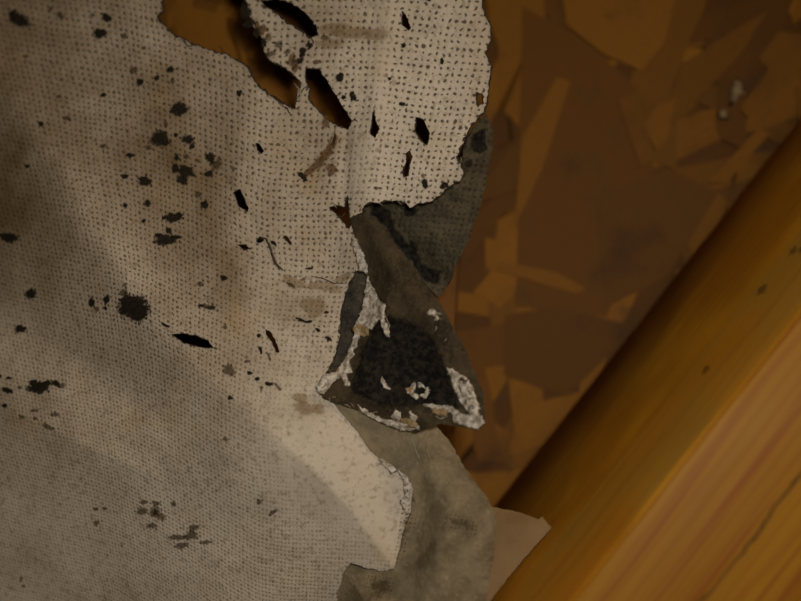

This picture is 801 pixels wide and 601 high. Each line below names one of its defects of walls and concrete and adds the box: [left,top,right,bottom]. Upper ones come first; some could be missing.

leakage [8,9,33,29]
leakage [91,13,112,39]
leakage [240,0,321,70]
leakage [144,101,222,185]
leakage [120,174,152,187]
leakage [153,211,184,247]
leakage [88,283,155,326]
peeling [316,115,496,601]
leakage [0,375,66,408]
leakage [135,500,166,529]
leakage [166,525,211,550]
crack [699,473,801,601]